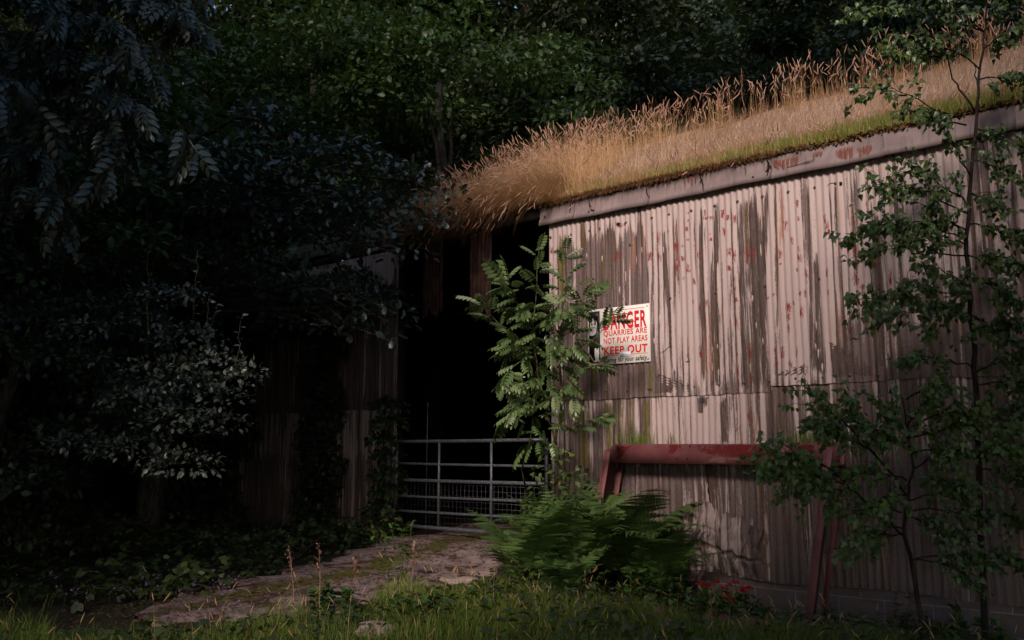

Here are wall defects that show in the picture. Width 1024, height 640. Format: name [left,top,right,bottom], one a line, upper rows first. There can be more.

corrosion [703,209,756,279]
corrosion [778,200,808,331]
water stain [738,183,888,439]